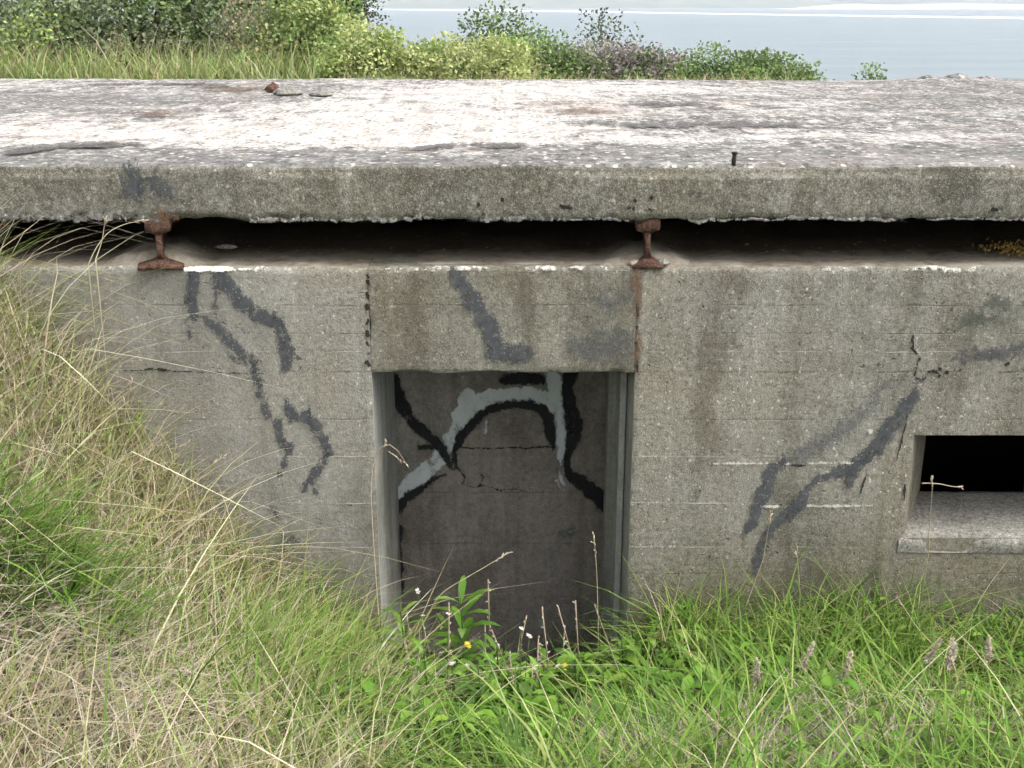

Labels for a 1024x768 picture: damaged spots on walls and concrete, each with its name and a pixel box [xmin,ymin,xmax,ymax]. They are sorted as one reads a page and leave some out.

crack [897,335,926,381]
crack [453,445,552,494]